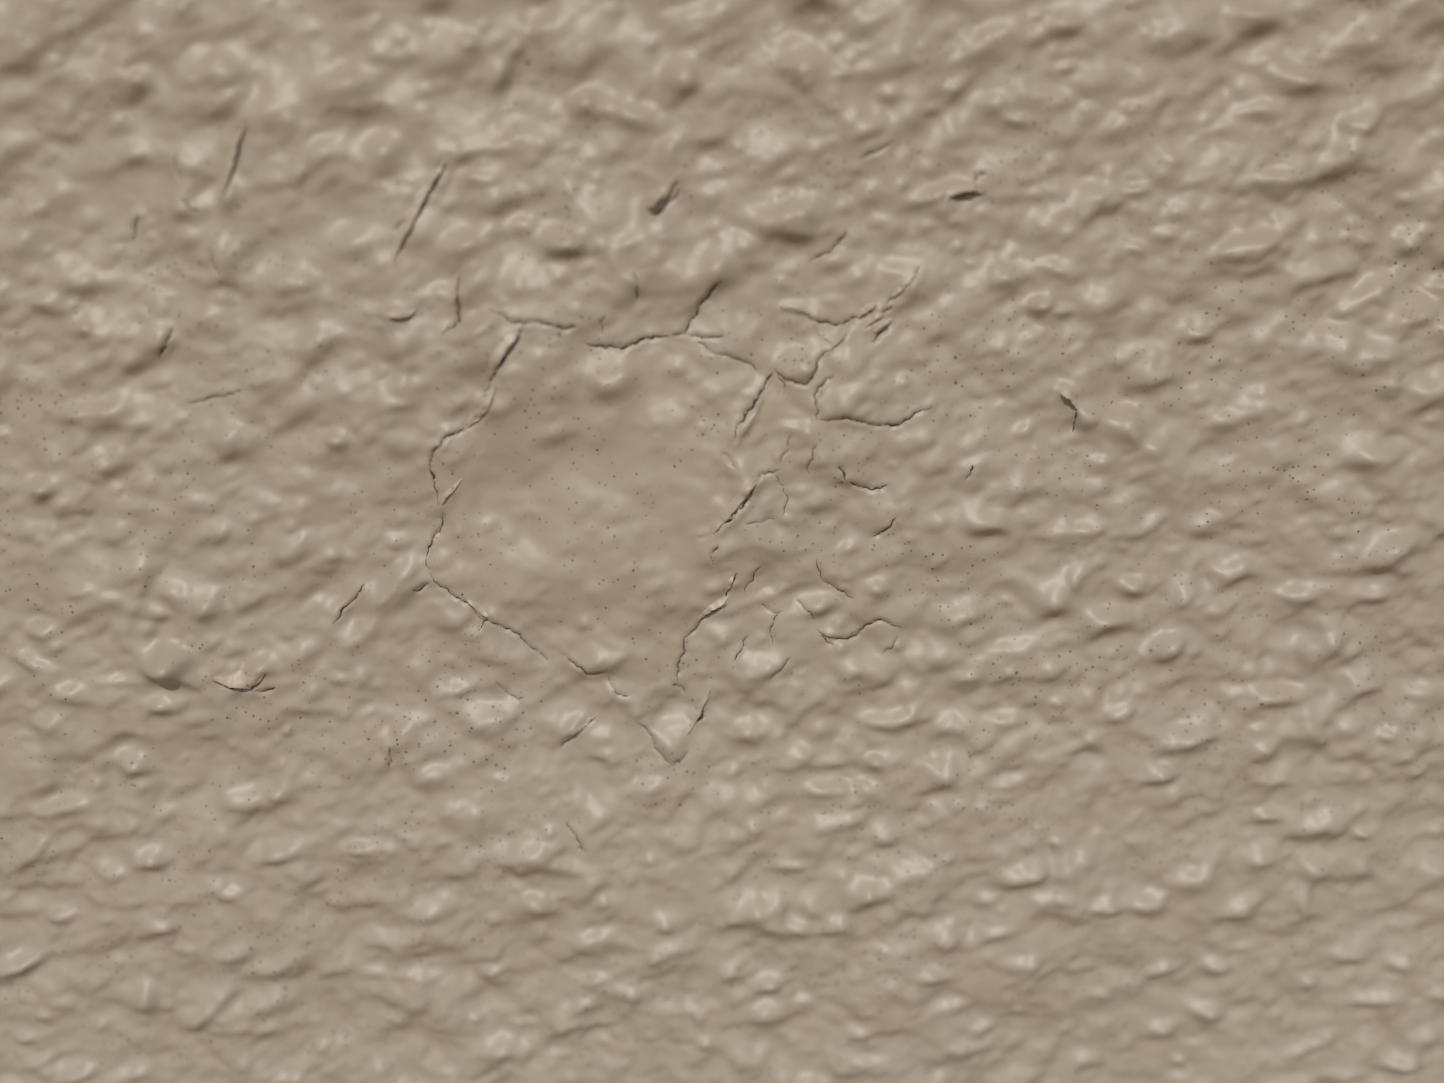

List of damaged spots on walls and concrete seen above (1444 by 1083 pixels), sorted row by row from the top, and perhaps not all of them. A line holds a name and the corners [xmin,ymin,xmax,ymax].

crack [332,583,365,624]
crack [414,273,932,765]